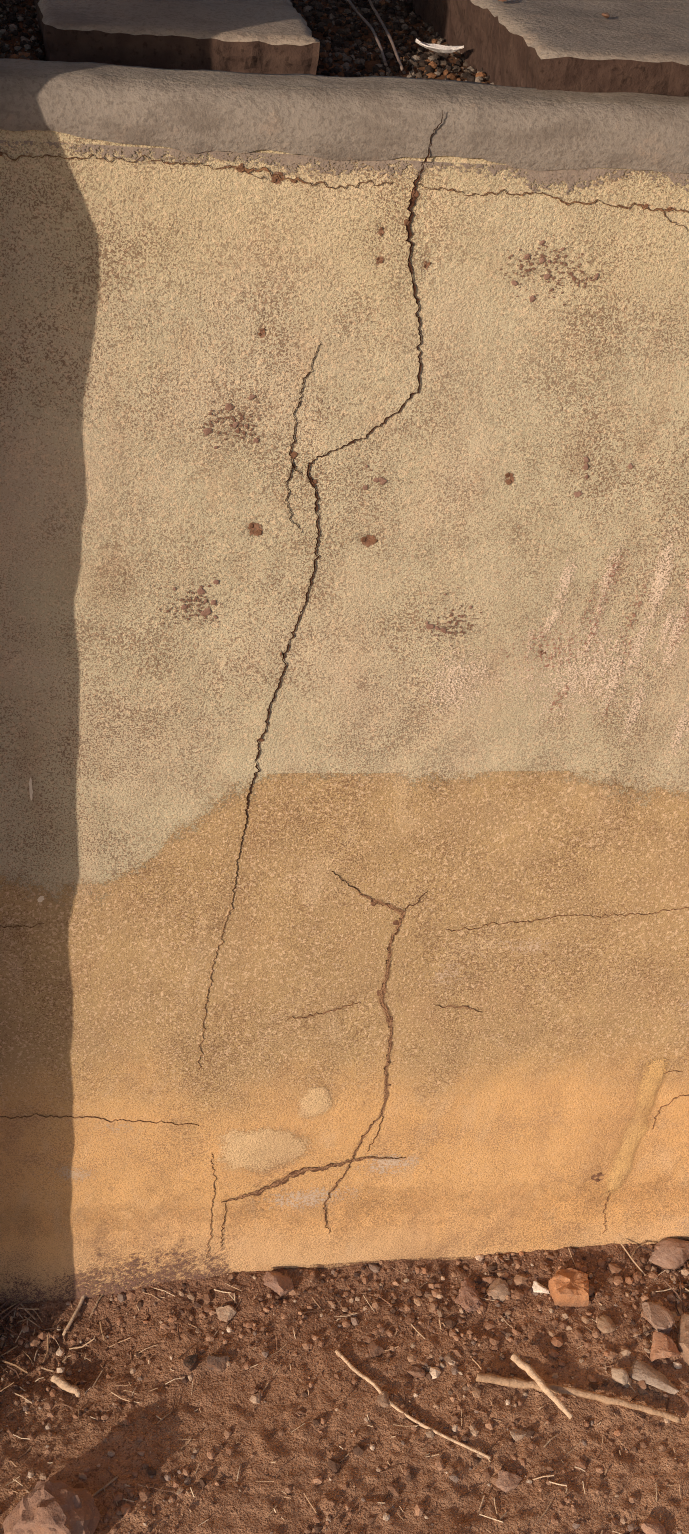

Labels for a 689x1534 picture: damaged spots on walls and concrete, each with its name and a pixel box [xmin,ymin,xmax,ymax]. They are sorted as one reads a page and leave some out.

crack [0,871,427,1259]
crack [0,110,689,1070]
water stain [0,523,689,1278]
crack [640,1070,689,1129]